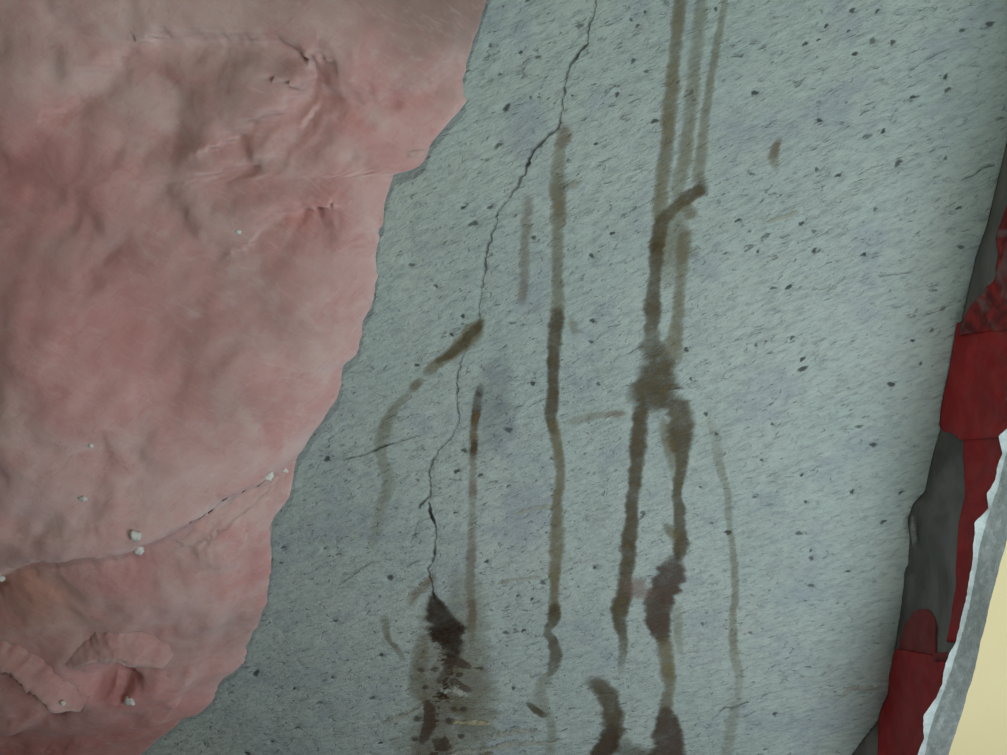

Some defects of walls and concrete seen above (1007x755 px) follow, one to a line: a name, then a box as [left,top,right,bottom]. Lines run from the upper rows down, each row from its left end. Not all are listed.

crack [517,20,592,188]
crack [485,207,503,273]
leakage [552,185,564,224]
leakage [432,323,482,368]
leakage [590,0,706,755]
crack [419,371,460,596]
leakage [545,309,564,670]
leakage [413,595,470,755]